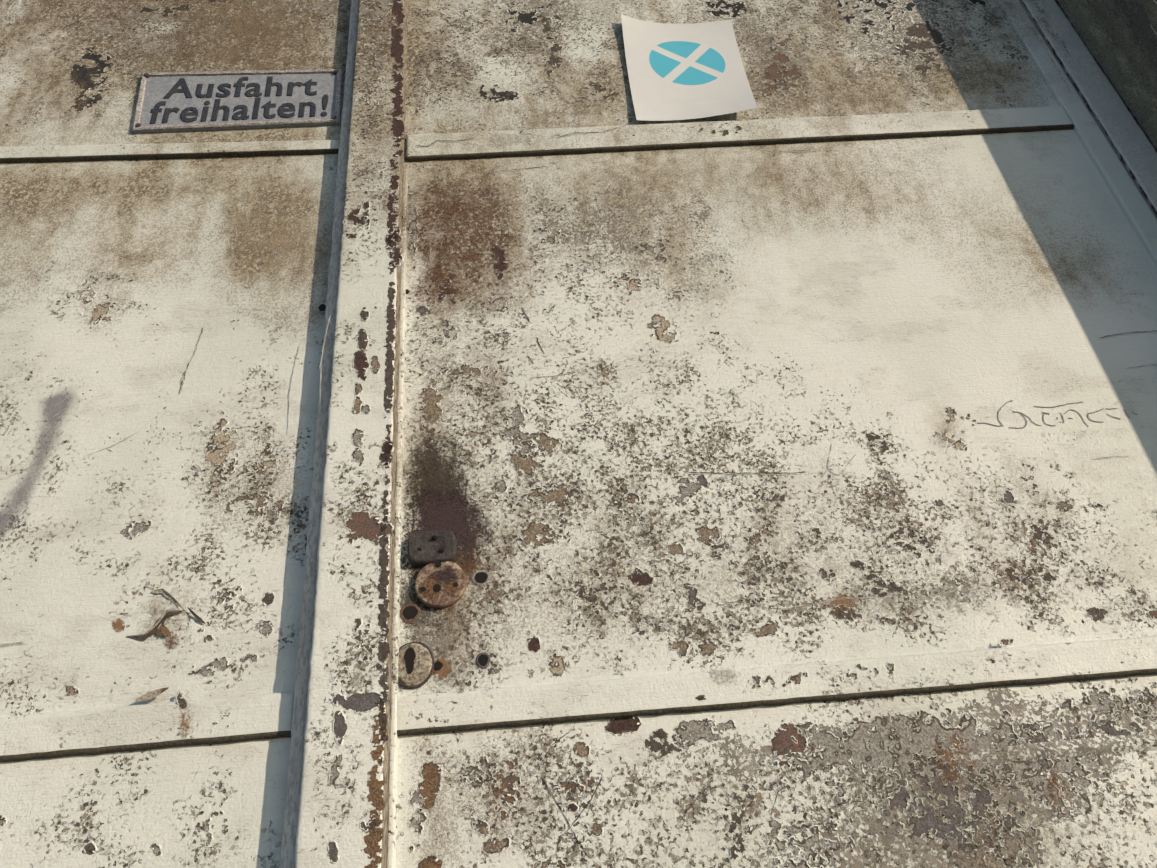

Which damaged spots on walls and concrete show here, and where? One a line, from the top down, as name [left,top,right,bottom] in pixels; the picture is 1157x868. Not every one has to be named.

peeling [69,45,114,111]
damp [139,0,341,86]
peeling [835,0,954,76]
peeling [204,411,285,518]
rust [364,0,411,868]
peeling [502,403,568,507]
peeling [674,473,725,561]
peeling [850,559,908,599]
peeling [187,653,266,677]
peeling [526,635,570,678]
peeling [605,716,737,760]
peeling [717,681,1157,868]